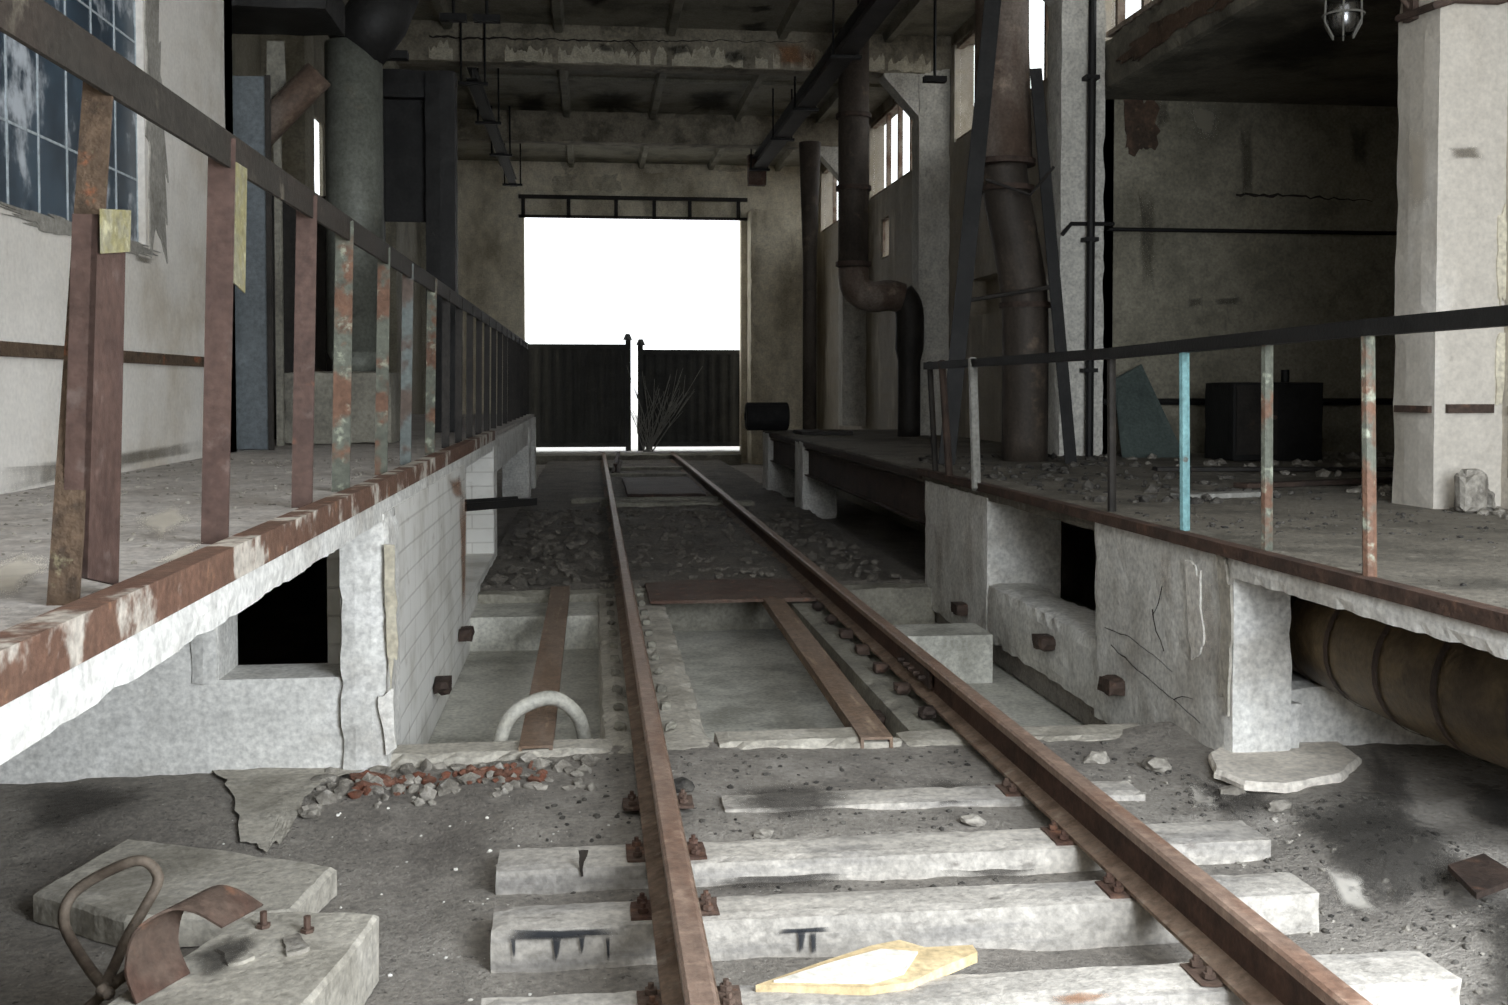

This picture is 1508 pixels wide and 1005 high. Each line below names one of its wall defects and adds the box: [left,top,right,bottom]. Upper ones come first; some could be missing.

peeling [429,40,453,60]
peeling [505,43,823,70]
peeling [869,53,931,73]